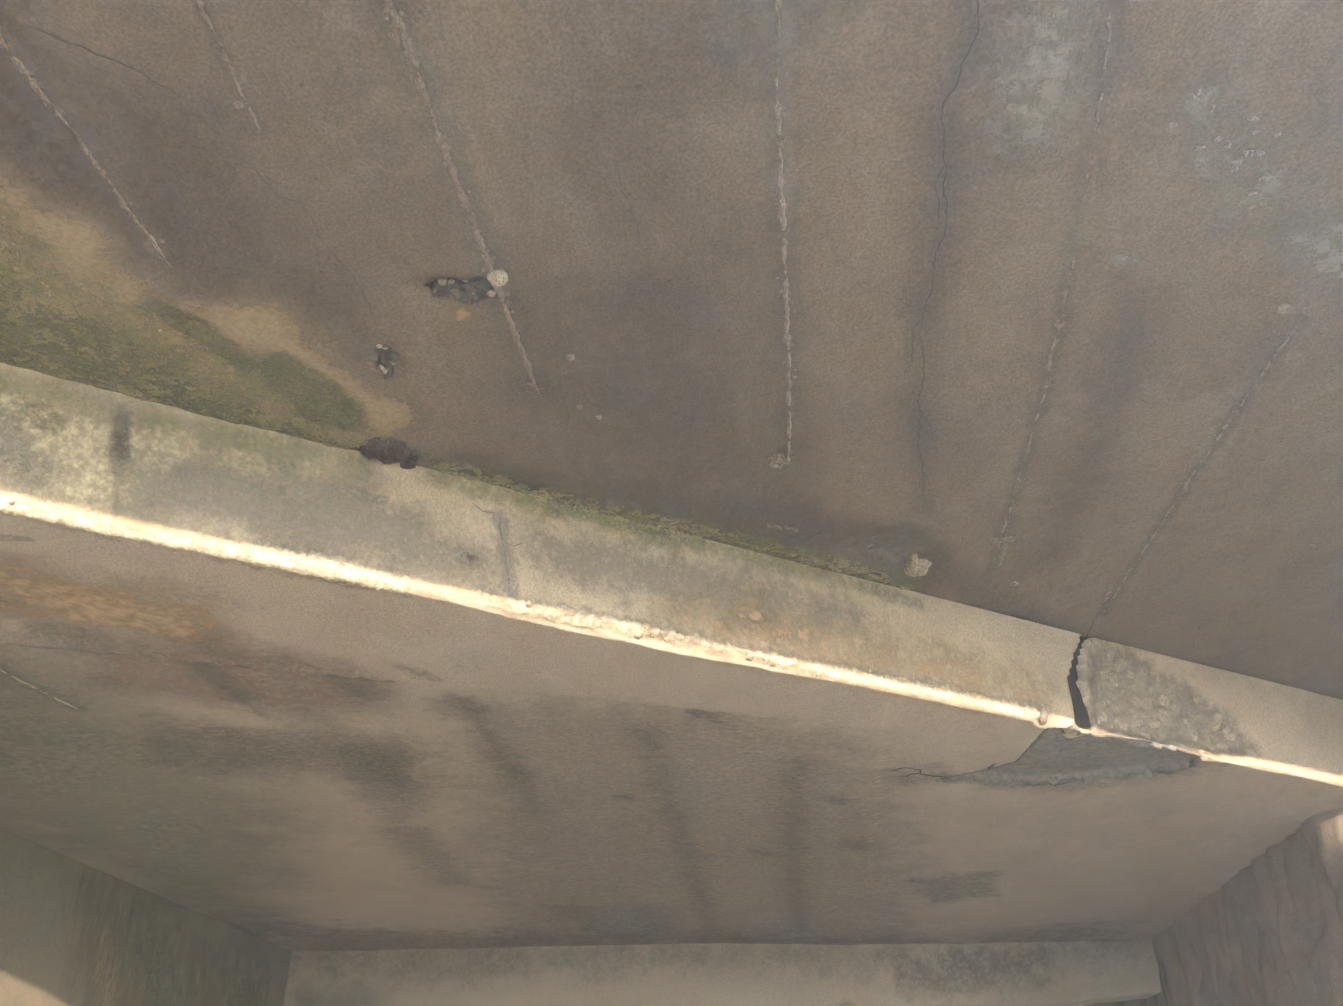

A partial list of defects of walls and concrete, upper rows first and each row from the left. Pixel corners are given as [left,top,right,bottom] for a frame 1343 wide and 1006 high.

crack [21,22,184,99]
peeling [0,170,417,451]
spalling [424,277,496,305]
crack [911,0,979,513]
water stain [0,385,338,511]
spalling [0,496,413,595]
crack [987,587,1115,786]